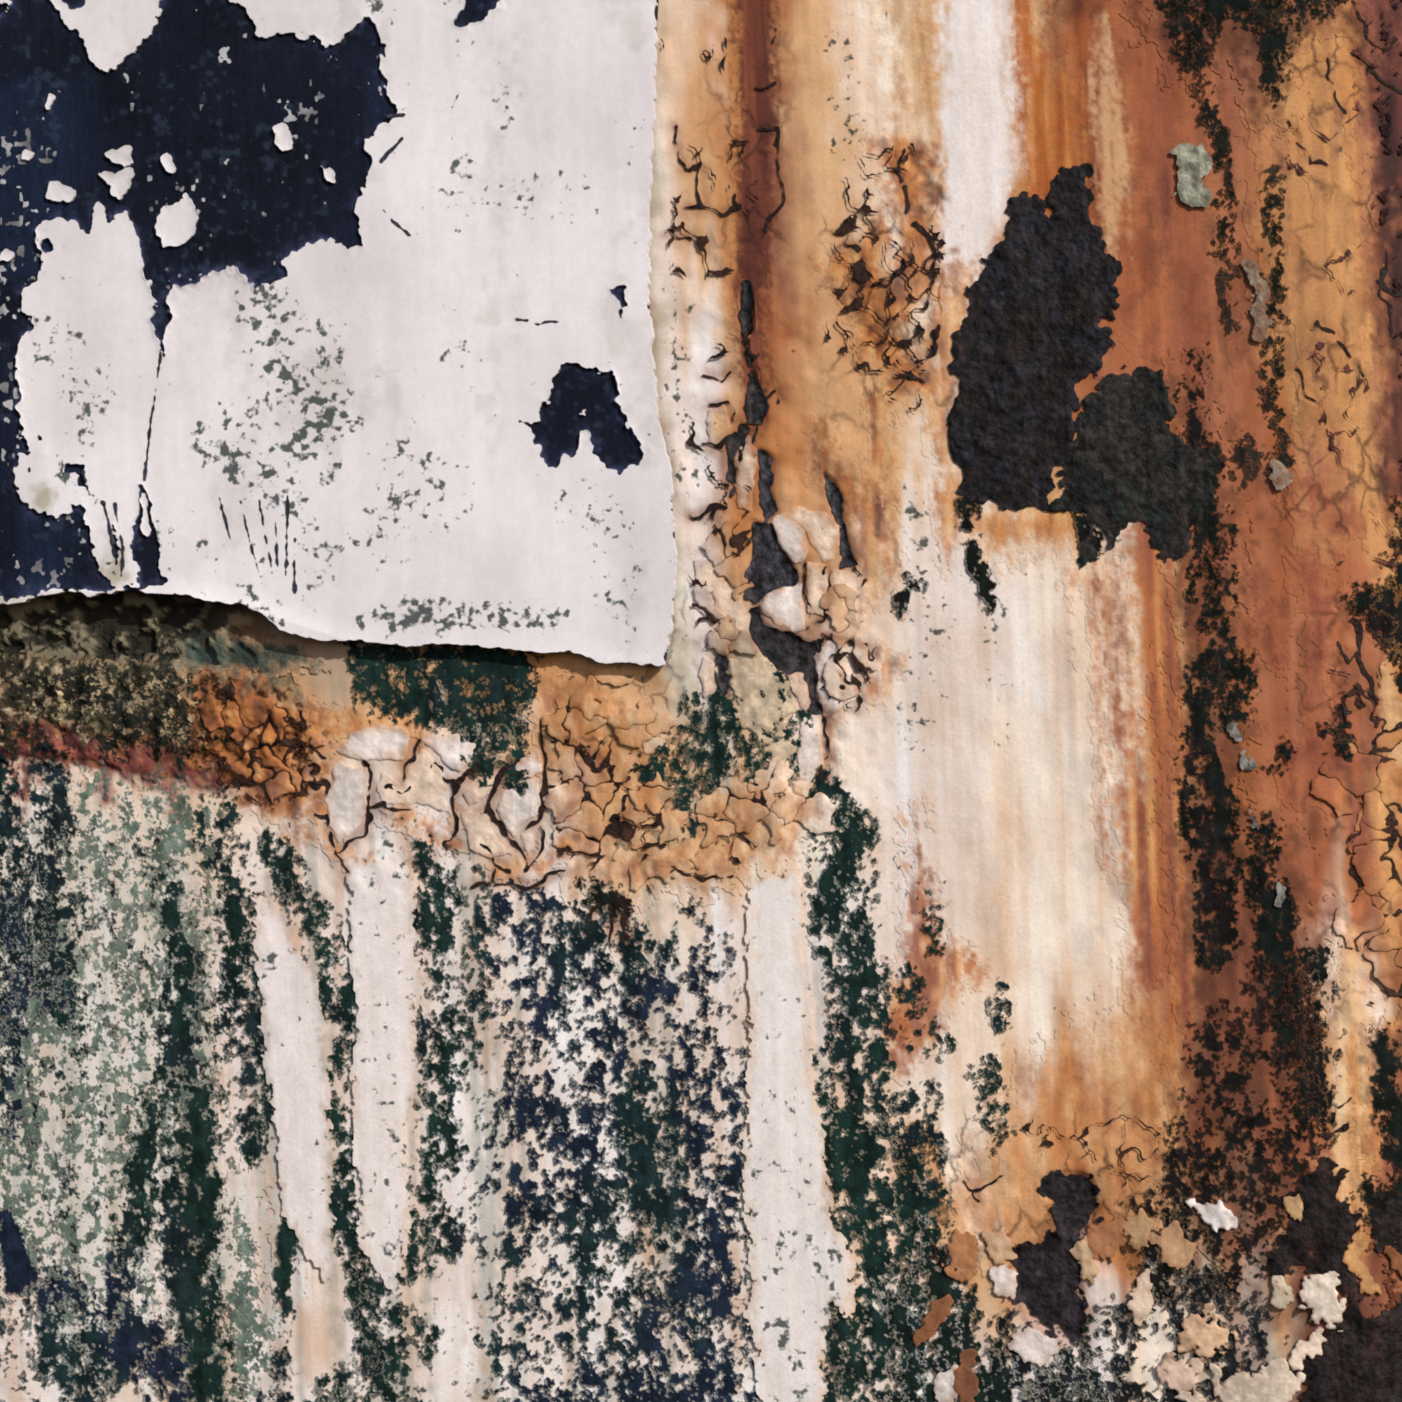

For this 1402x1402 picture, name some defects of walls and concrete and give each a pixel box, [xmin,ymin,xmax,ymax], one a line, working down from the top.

peeling [0,0,398,602]
peeling [519,363,644,475]
crack [825,143,946,415]
leakage [1368,71,1402,164]
leakage [1375,187,1402,239]
rust [0,664,429,873]
crack [198,562,881,943]
rust [485,637,913,966]
leakage [0,335,1402,1402]
rust [796,0,1402,1317]
crack [1311,617,1402,1005]
peeling [1153,1152,1402,1402]